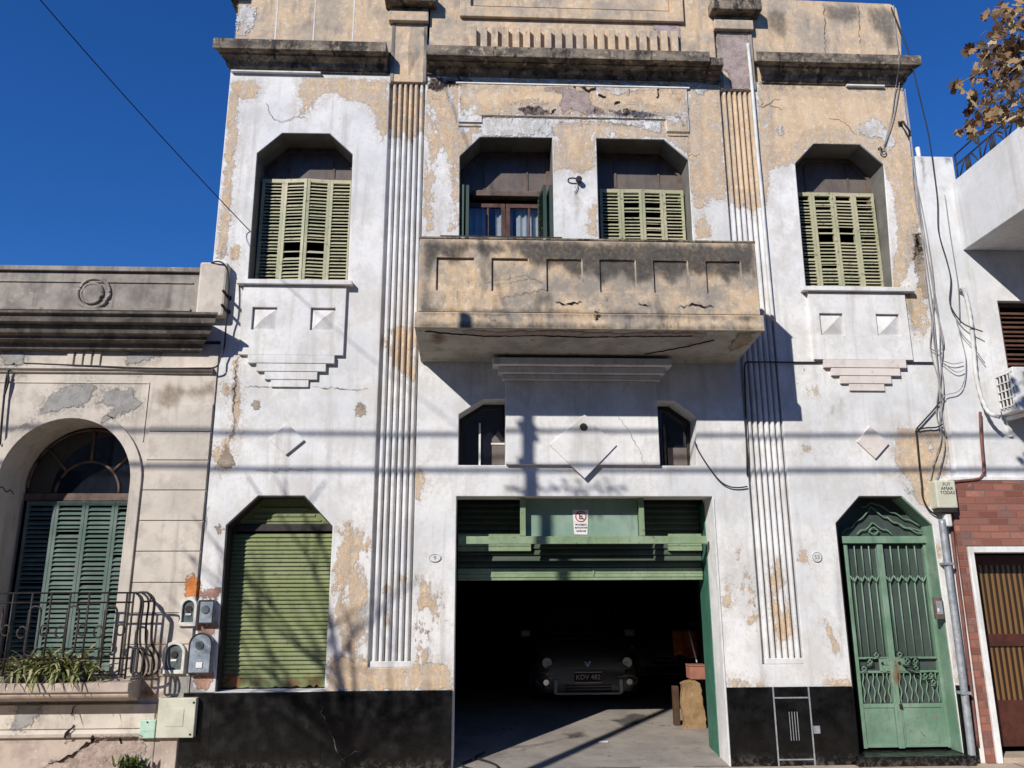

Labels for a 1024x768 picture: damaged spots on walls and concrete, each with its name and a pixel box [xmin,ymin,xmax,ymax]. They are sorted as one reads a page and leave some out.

peeling [216,80,261,260]
peeling [298,34,931,337]
crack [490,275,581,305]
crack [425,331,714,355]
peeling [210,360,261,471]
peeling [892,428,949,507]
corrosion [184,573,202,598]
peeling [325,522,453,691]
peeling [721,572,758,625]
peeling [767,558,792,641]
peeling [824,619,840,655]
peeling [826,678,852,686]